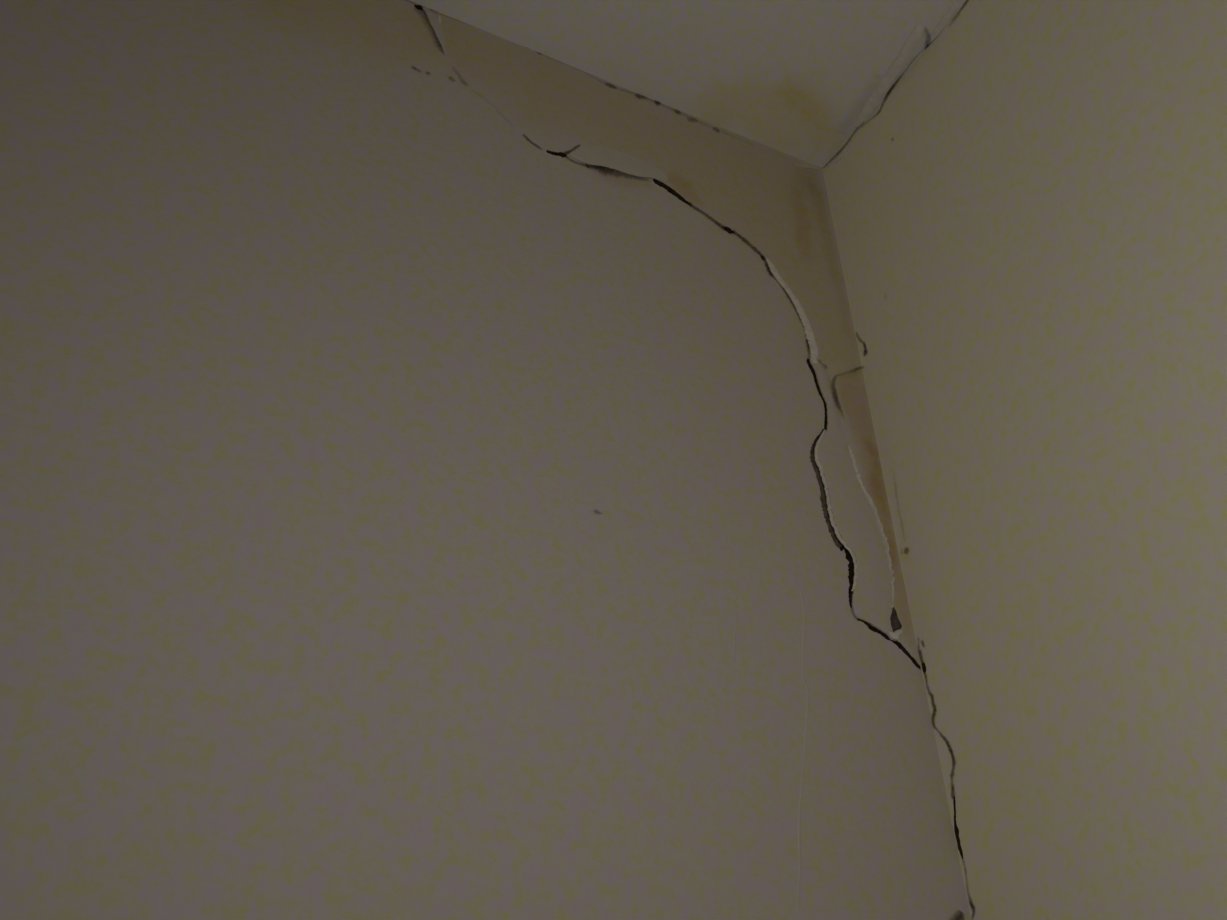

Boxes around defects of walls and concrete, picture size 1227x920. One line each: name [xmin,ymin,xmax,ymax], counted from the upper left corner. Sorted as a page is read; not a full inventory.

crack [527,138,613,174]
peeling [569,145,669,183]
crack [653,179,963,859]
peeling [813,363,903,641]